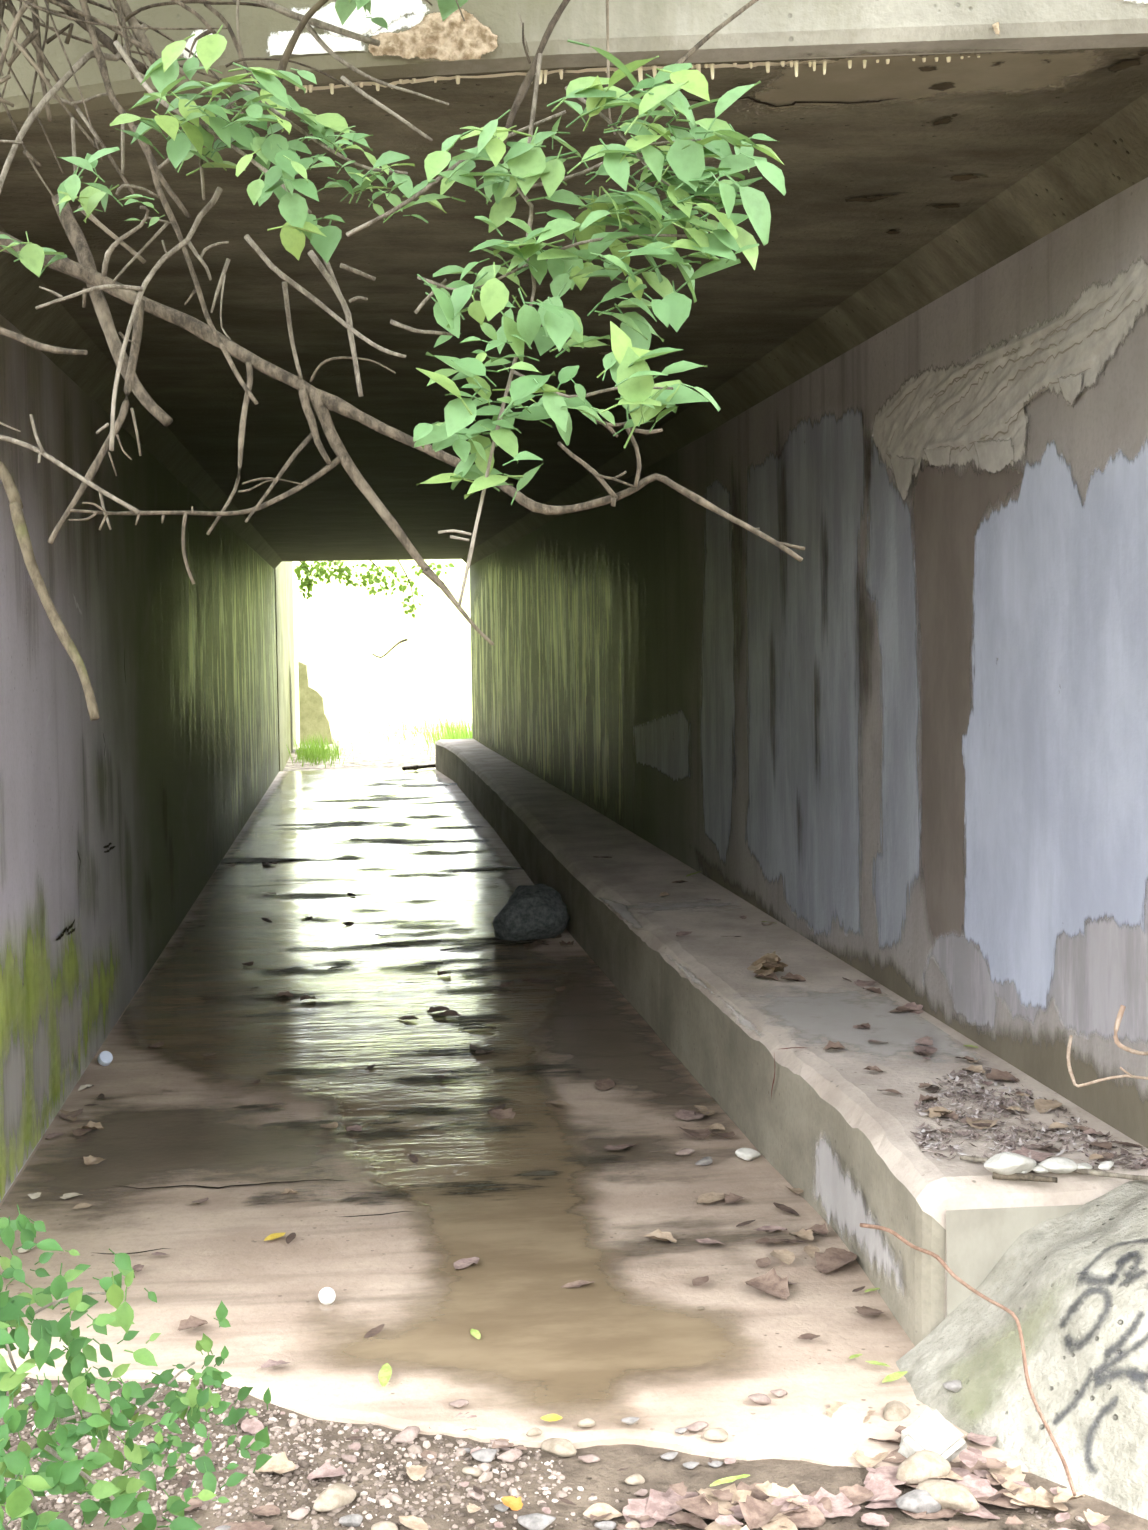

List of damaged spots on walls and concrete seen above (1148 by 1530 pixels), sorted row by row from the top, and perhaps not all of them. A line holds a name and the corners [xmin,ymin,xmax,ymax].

crack [687,97,897,107]
peeling [633,258,1148,1042]